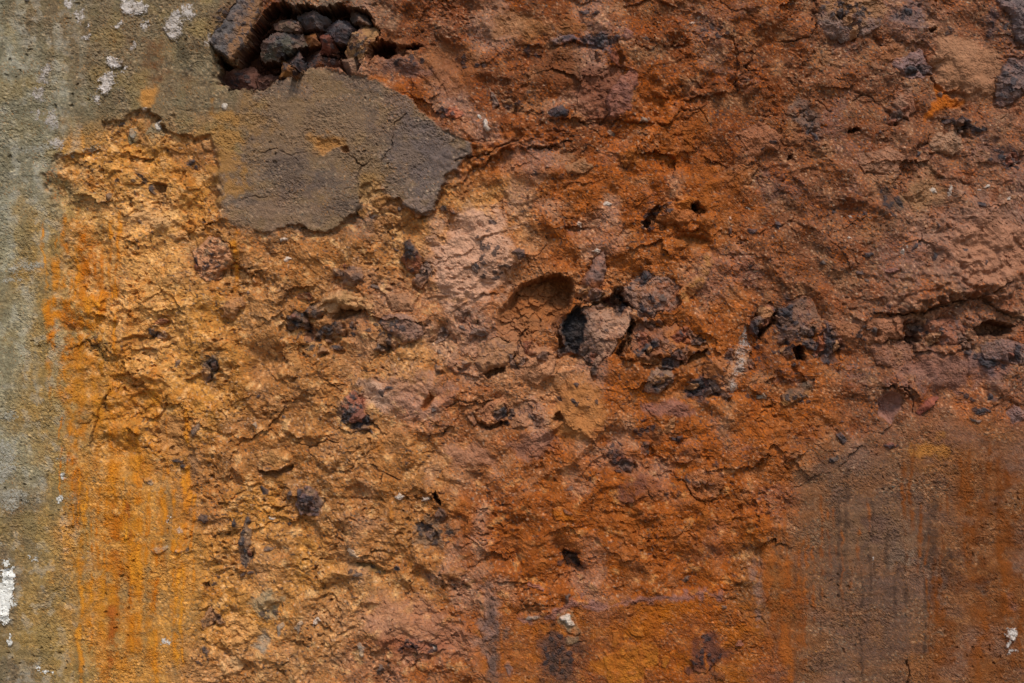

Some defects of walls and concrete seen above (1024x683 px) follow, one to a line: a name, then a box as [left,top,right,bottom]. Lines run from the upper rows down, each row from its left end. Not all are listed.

rust [41,212,122,398]
spalling [40,109,814,683]
spalling [255,0,1024,478]
rust [75,561,105,683]
rust [58,426,197,663]